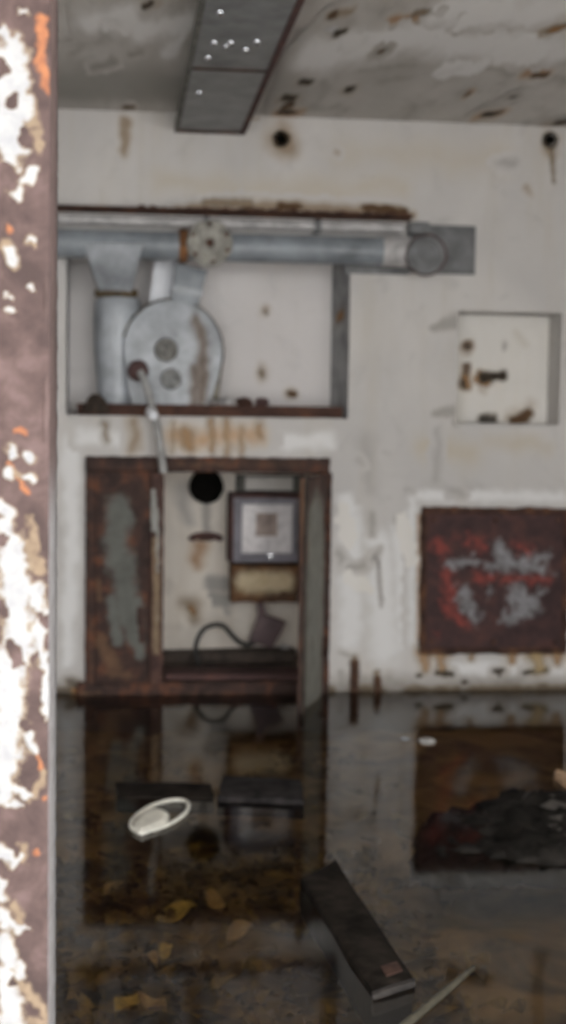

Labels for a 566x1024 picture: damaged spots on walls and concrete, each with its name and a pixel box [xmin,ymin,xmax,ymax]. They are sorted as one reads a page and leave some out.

corrosion [381,6,430,31]
corrosion [532,18,566,40]
corrosion [510,64,563,83]
corrosion [533,126,566,183]
corrosion [166,189,422,229]
corrosion [457,359,477,398]
corrosion [103,416,284,458]